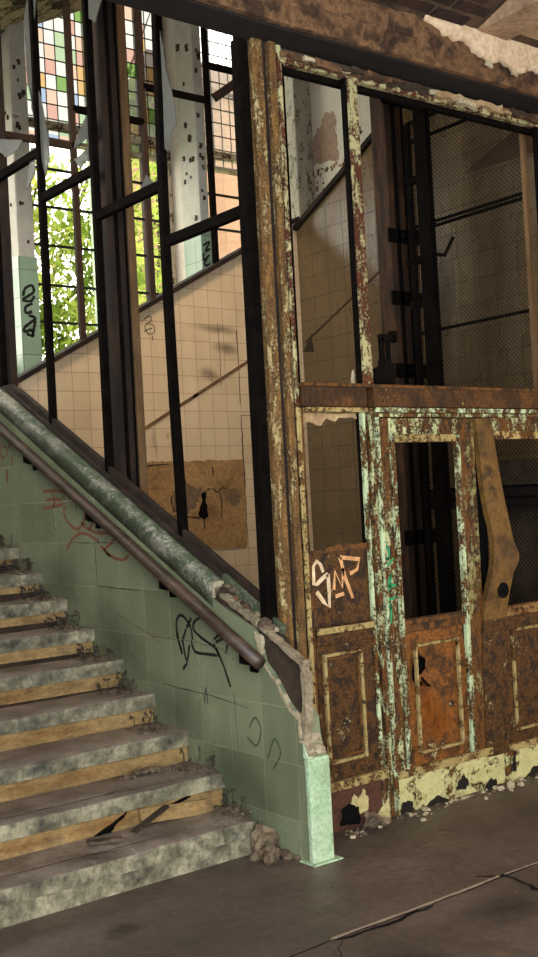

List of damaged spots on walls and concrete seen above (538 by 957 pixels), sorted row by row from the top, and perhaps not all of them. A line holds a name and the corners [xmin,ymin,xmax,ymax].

flaking render [423,15,538,77]
flaking render [279,51,538,124]
peeling [313,110,344,196]
spalling [212,573,326,757]
peeling [351,789,414,817]
peeling [427,795,450,807]
peeling [455,775,469,790]
peeling [513,750,538,777]
crack [289,861,538,957]